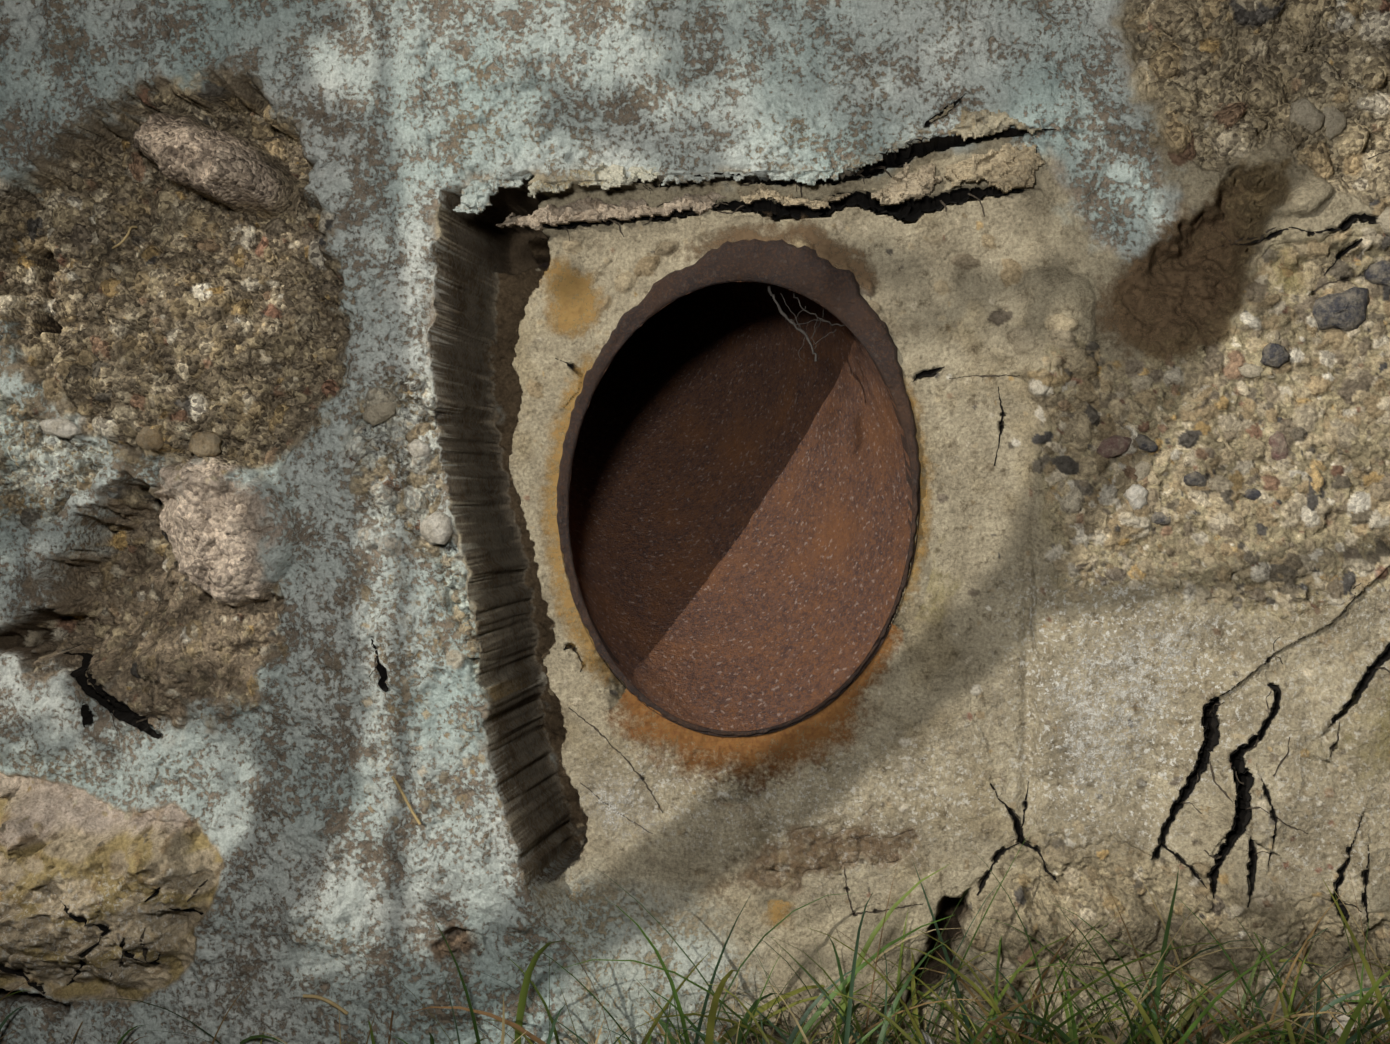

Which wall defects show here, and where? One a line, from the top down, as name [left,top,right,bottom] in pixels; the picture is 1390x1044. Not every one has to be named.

peeling [453,103,1045,231]
crack [542,93,1057,241]
rust [544,261,601,335]
rust [686,222,878,292]
spalling [0,75,355,730]
rust [542,362,609,674]
rust [902,391,928,600]
rust [610,623,903,787]
crack [1153,569,1390,908]
spalling [751,827,917,891]
crack [977,781,1058,896]
crack [1332,813,1370,933]